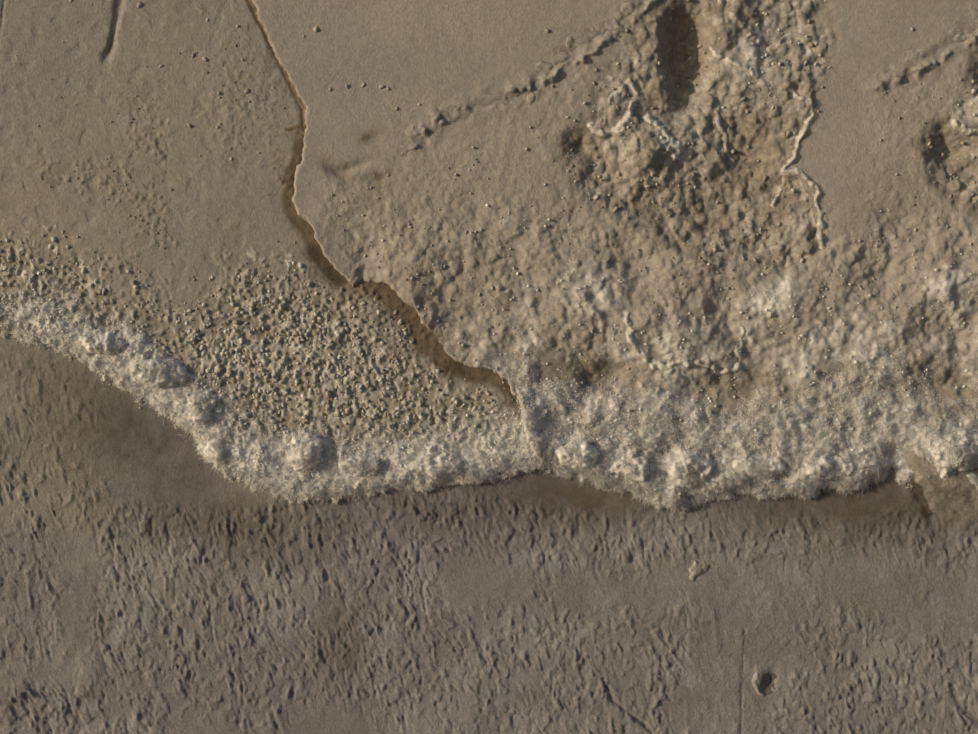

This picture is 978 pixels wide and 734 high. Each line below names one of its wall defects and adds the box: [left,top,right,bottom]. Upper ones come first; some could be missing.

leakage [719,11,786,88]
crack [246,0,522,430]
peeling [0,0,978,509]
leakage [0,243,978,522]
flaking render [895,447,978,528]